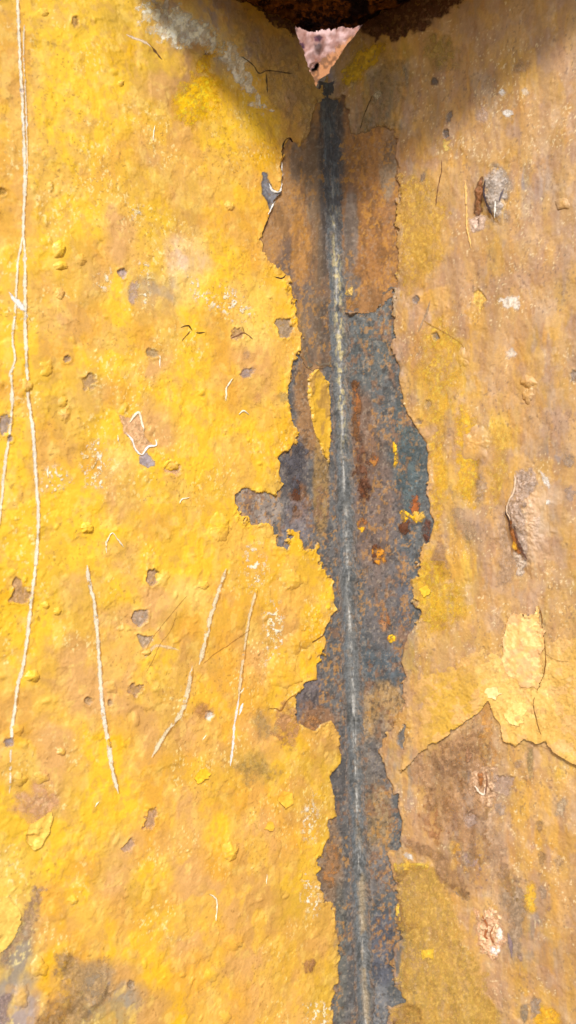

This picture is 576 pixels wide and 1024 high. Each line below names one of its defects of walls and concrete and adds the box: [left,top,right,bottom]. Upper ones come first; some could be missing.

peeling [235,96,576,1024]
corrosion [410,707,506,878]